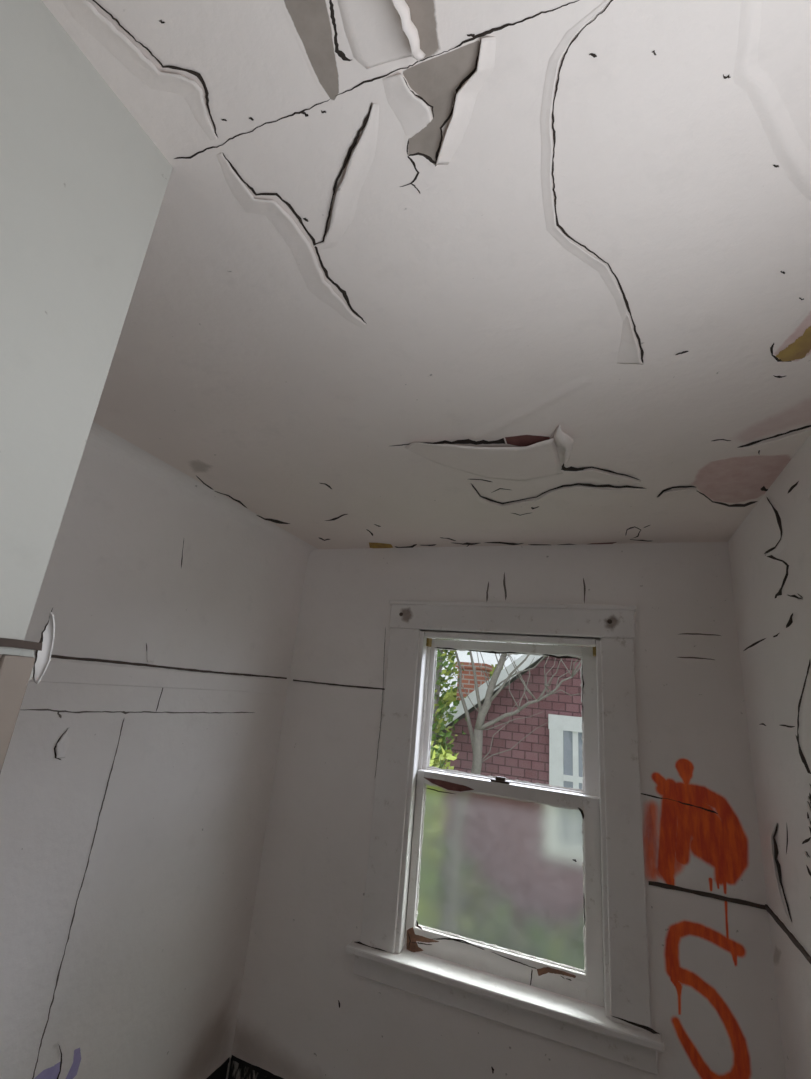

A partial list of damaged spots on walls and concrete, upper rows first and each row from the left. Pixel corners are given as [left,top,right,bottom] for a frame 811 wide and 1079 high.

peeling [279,0,496,168]
crack [62,0,644,365]
flaking render [769,297,811,365]
crack [197,477,290,524]
peeling [393,425,581,481]
crack [468,467,697,516]
peeling [688,450,795,507]
crack [712,425,811,651]
peeling [19,608,55,684]
crack [759,723,811,774]
crack [767,822,811,923]
peeling [406,926,440,953]